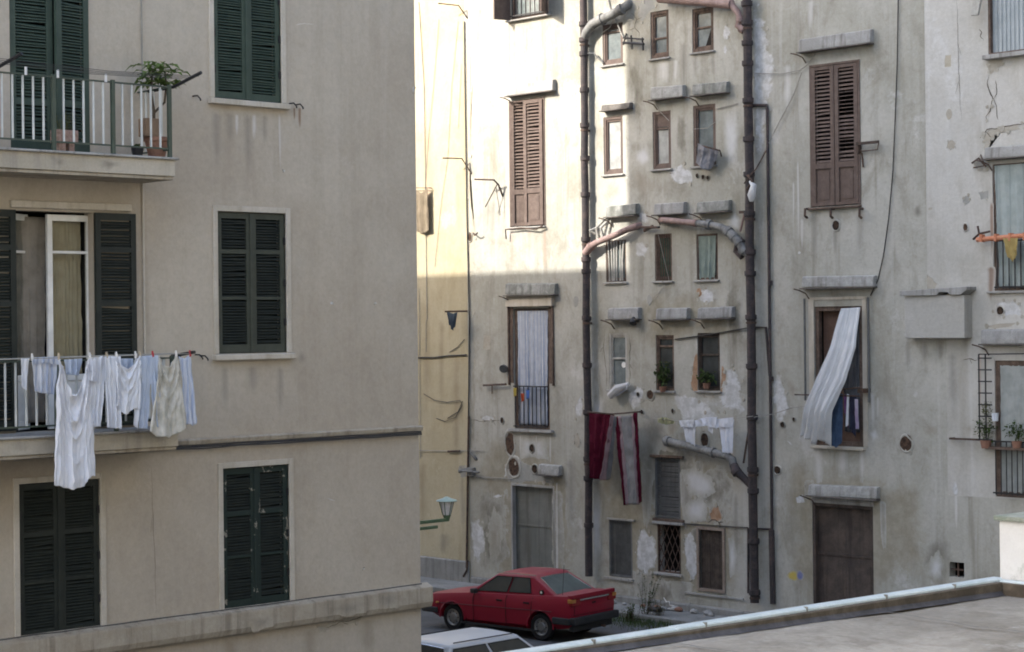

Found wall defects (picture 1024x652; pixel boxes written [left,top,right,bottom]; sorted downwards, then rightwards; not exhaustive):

crack [955,0,1024,142]
spalling [974,99,1024,172]
peeling [669,161,710,186]
peeling [671,353,746,447]
peeling [772,371,796,428]
peeling [469,311,558,568]
peeling [635,528,657,578]